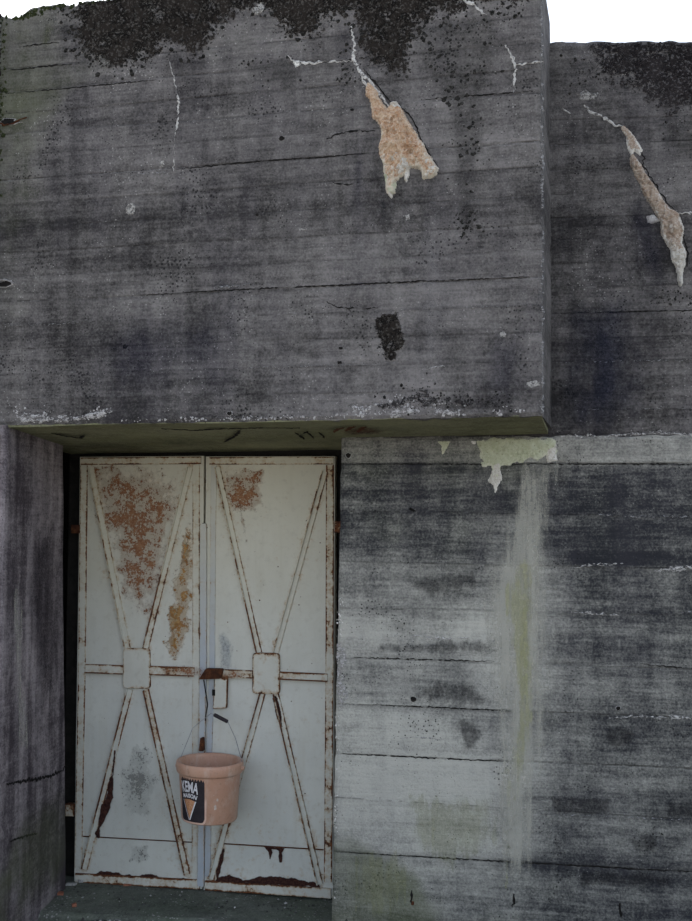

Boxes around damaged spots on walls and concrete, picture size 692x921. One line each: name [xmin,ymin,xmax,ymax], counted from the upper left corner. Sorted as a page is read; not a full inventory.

crack [0,14,389,197]
spalling [363,68,439,199]
crack [425,45,543,100]
spalling [621,126,689,287]
rust [93,465,179,615]
rust [162,532,201,675]
rust [224,468,262,511]
damp [471,437,557,869]
rust [95,750,124,838]
rust [215,847,320,888]